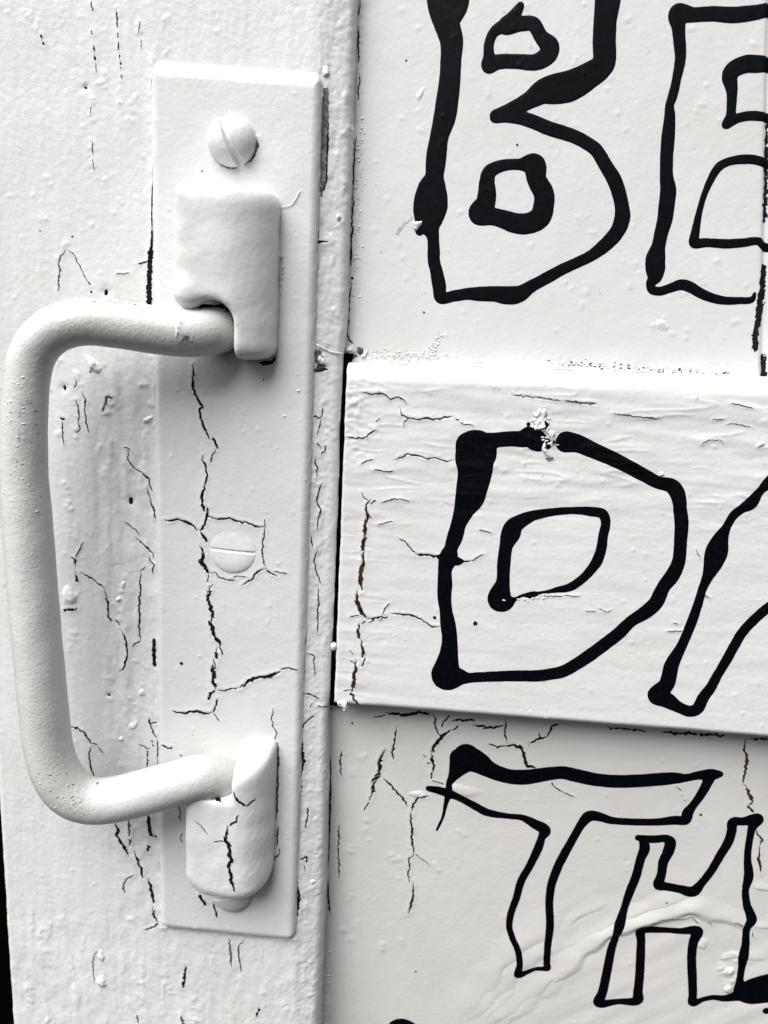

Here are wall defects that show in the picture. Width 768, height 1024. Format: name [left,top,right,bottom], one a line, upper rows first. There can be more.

crack [60,380,89,444]
peeling [530,408,560,460]
crack [515,394,660,419]
crack [703,403,752,443]
crack [71,367,574,930]
crack [742,740,763,873]